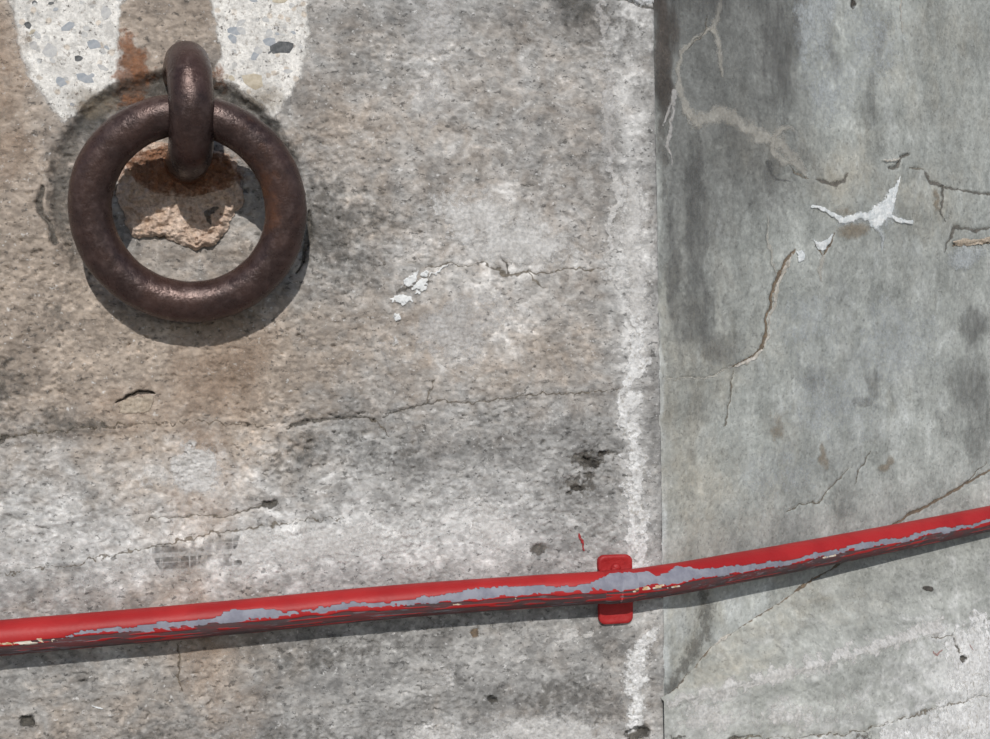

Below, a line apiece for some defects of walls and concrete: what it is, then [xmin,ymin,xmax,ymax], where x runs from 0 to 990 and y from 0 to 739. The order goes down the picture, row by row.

rust [112,33,155,105]
leakage [654,0,677,111]
crack [664,0,848,187]
crack [925,172,990,222]
crack [427,255,608,288]
crack [663,216,796,426]
crack [0,379,618,444]
crack [786,451,871,512]
crack [893,462,990,524]
crack [672,563,840,691]
crack [932,635,967,663]